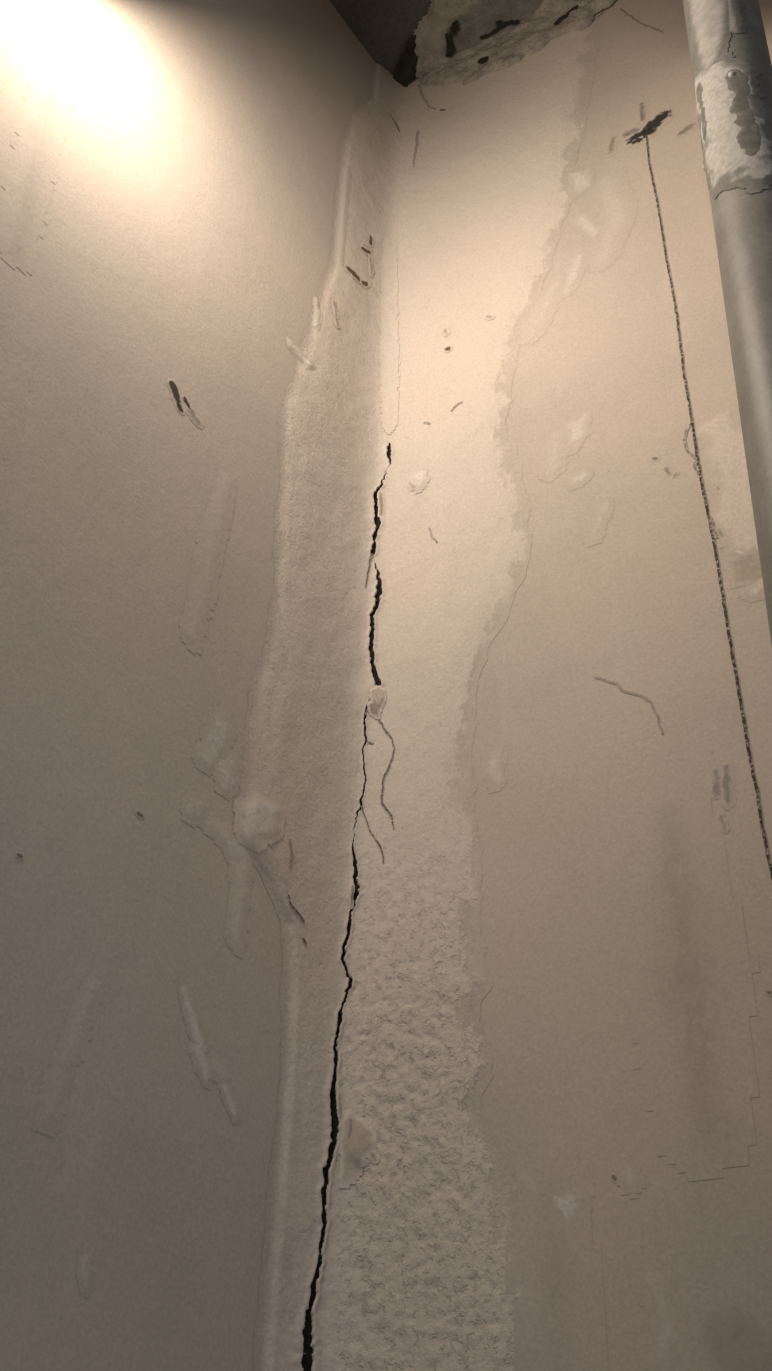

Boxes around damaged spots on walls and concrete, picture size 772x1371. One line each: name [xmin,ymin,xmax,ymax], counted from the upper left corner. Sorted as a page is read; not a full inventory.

flaking render [393,0,616,87]
crack [646,135,772,881]
crack [594,676,664,735]
crack [288,839,307,945]
crack [301,443,395,1371]